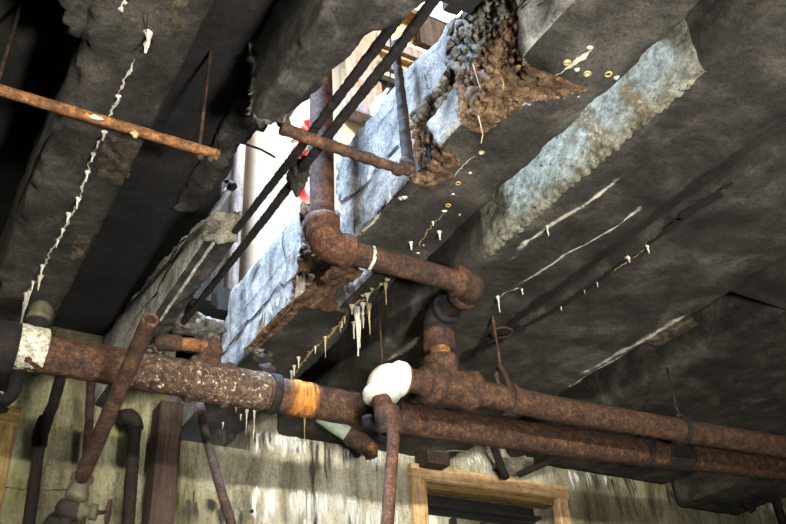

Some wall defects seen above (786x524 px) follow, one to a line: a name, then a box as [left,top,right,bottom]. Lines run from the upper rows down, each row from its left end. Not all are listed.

leakage [143,29,153,54]
spalling [245,43,296,129]
spalling [307,0,441,140]
leakage [563,46,594,77]
leakage [20,59,135,323]
spalling [181,141,323,328]
spalling [243,201,368,357]
leakage [409,181,461,254]
leakage [519,183,613,248]
leakage [528,211,636,279]
leakage [290,276,393,379]